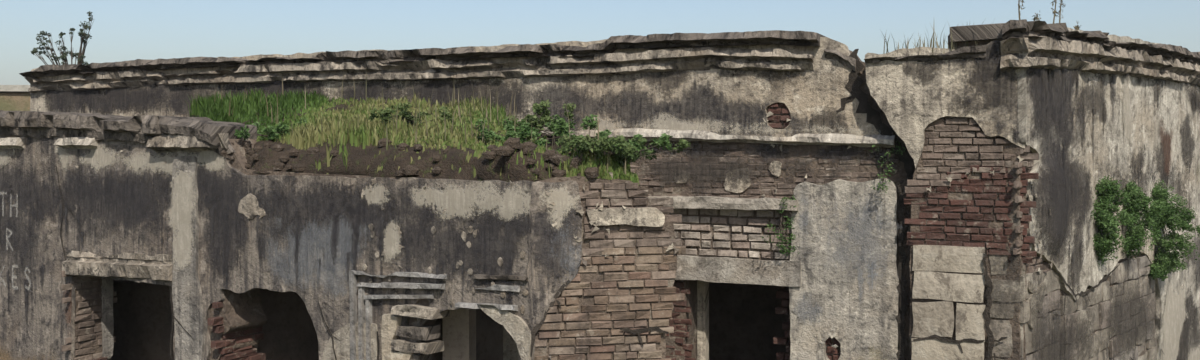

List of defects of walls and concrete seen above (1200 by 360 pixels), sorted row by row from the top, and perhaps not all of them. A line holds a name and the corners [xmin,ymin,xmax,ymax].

water stain [0,164,581,322]
peeling [361,178,388,210]
peeling [362,223,403,295]
spalling [760,102,791,128]
spalling [413,116,1158,360]
crack [837,49,1007,360]
water stain [904,38,1200,360]
rust [1161,129,1171,173]
crack [1054,265,1119,360]